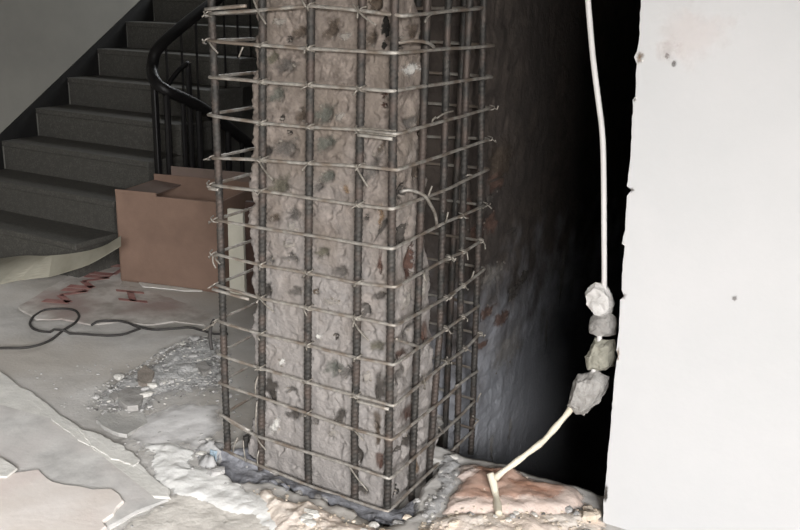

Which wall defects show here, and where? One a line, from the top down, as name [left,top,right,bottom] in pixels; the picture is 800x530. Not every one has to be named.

spalling [323,19,353,41]
spalling [366,0,390,49]
spalling [365,140,386,181]
spalling [374,219,416,279]
spalling [361,291,387,317]
spalling [326,362,353,378]
spalling [270,407,299,433]